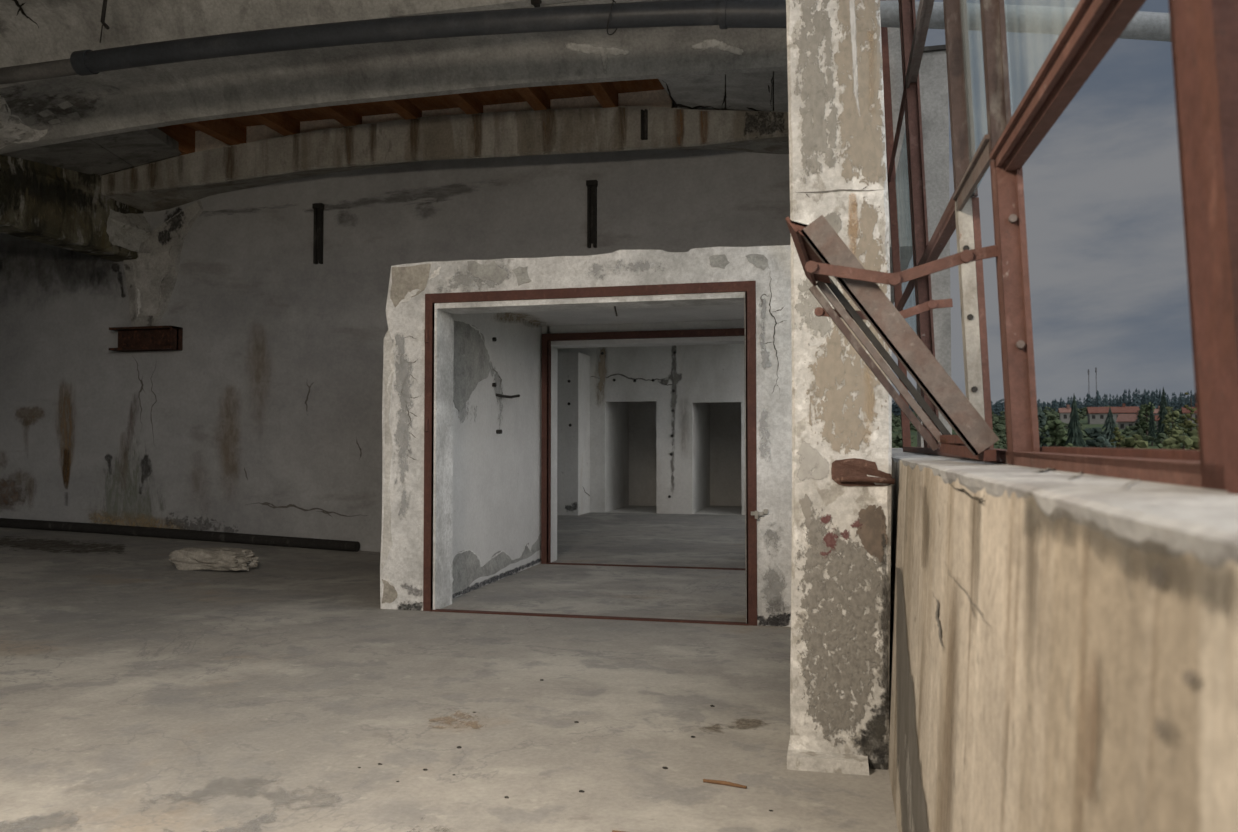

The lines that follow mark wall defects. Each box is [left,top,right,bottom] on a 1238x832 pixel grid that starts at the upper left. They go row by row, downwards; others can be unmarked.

crack [12,0,39,28]
peeling [0,95,48,149]
peeling [793,0,889,294]
damp [158,207,184,245]
flaking render [512,266,531,286]
flaking render [709,254,730,269]
flaking render [746,254,769,271]
crack [760,277,786,393]
flaking render [453,321,490,412]
corrosion [59,390,73,497]
crack [244,467,368,517]
peeling [452,534,541,595]